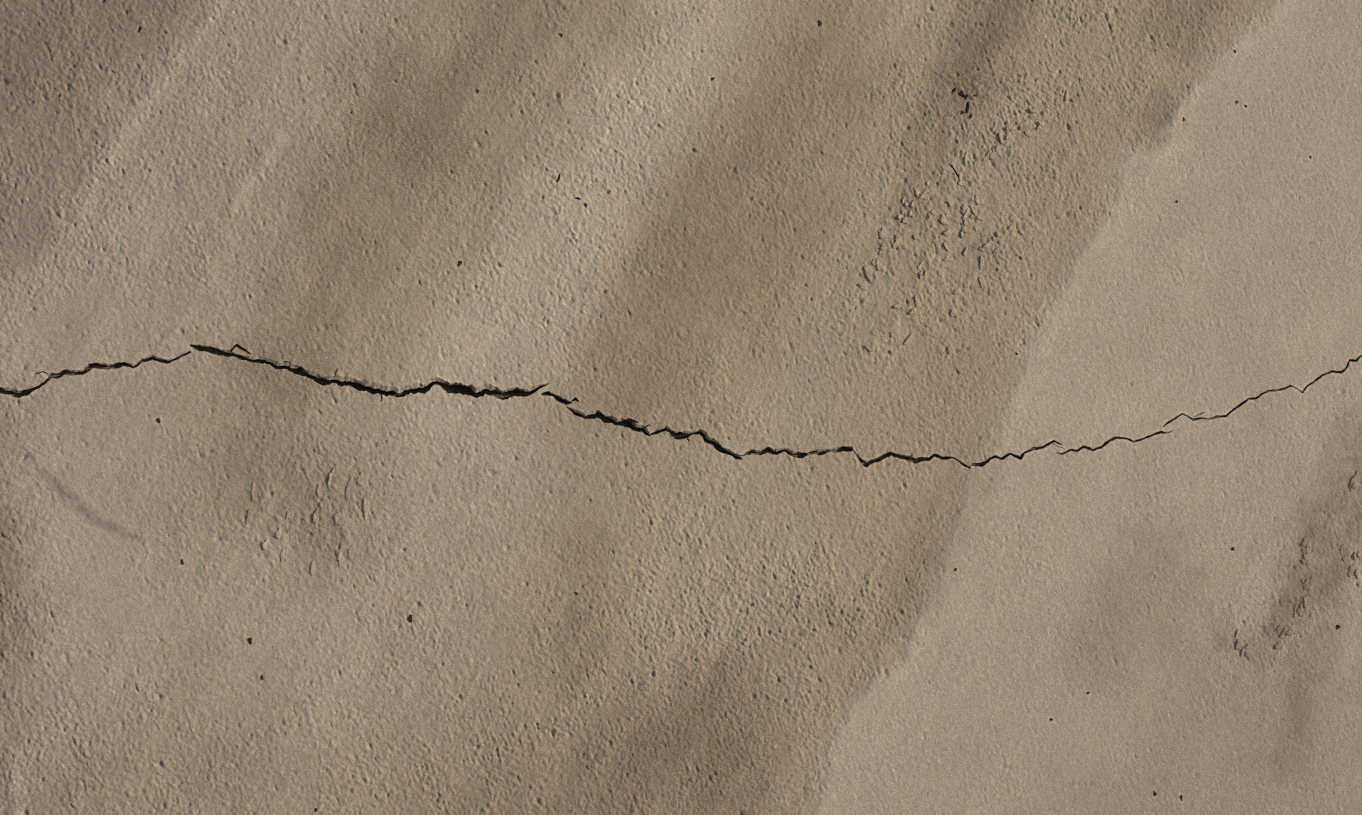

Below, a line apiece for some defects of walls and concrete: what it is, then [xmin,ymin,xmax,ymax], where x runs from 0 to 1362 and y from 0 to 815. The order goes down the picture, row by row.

crack [0,344,1362,469]